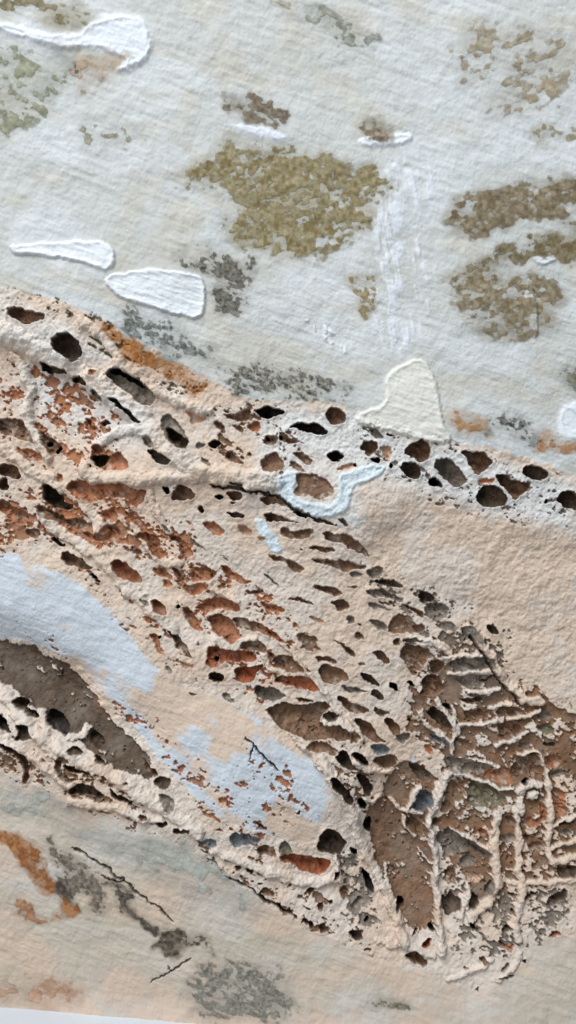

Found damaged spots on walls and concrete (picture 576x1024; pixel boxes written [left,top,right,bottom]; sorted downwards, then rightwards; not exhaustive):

leakage [450,25,570,115]
leakage [179,141,392,319]
leakage [446,176,576,239]
leakage [450,233,576,341]
rust [103,323,208,393]
crack [212,483,334,525]
spalling [0,287,576,992]
crack [245,737,280,772]
rust [0,831,80,924]
crack [72,847,174,923]
leakage [46,837,207,957]
crack [151,958,192,983]